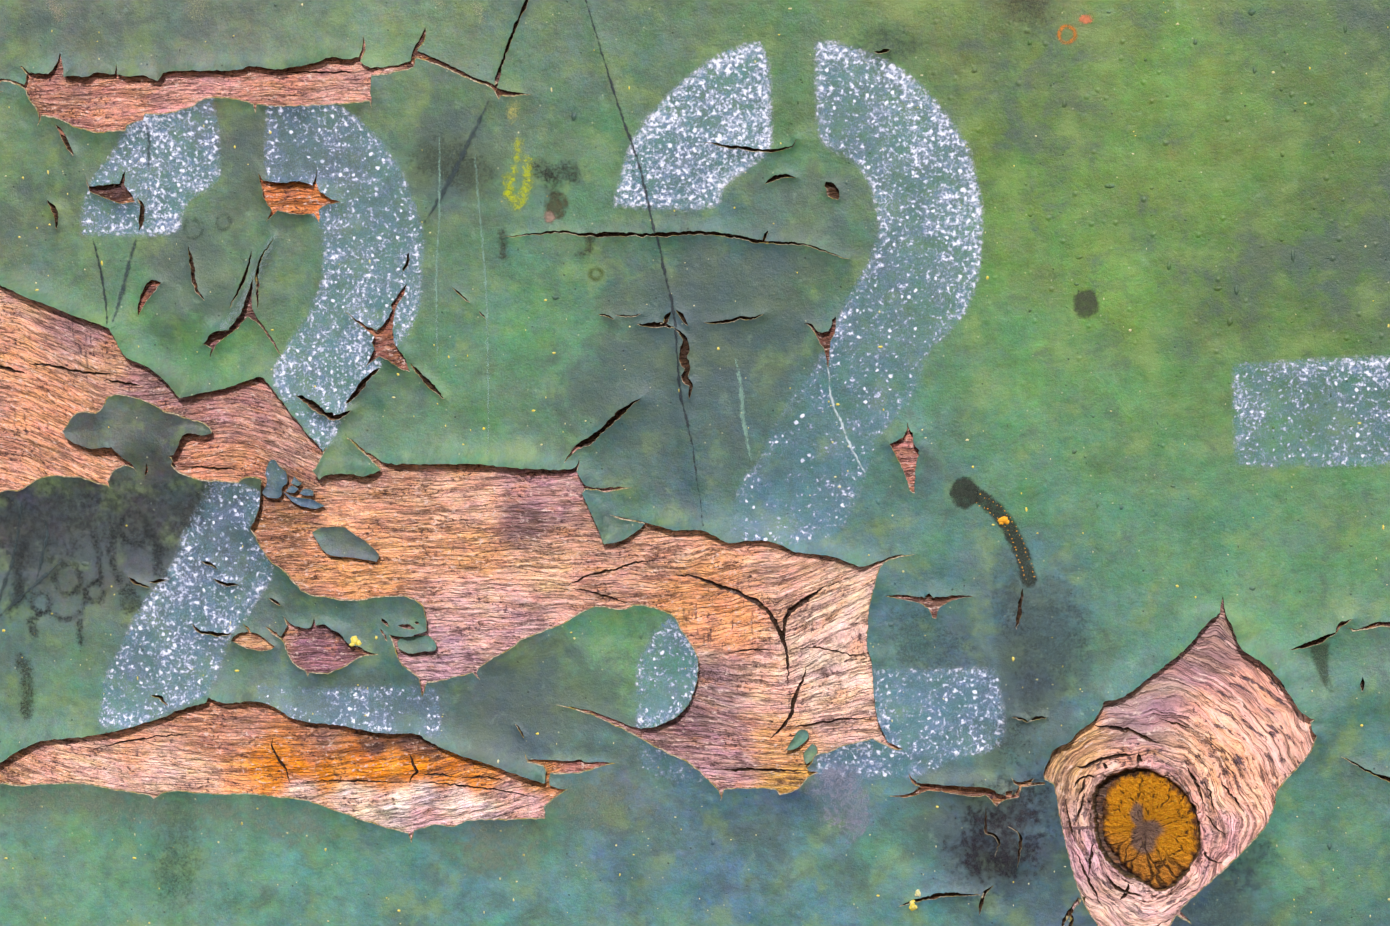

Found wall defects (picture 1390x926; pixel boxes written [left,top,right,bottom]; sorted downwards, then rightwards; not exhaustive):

peeling [0,29,531,144]
peeling [258,169,339,222]
crack [505,0,848,526]
peeling [0,680,615,842]
peeling [0,272,972,804]
crack [568,560,873,772]
peeling [890,596,1335,926]
peeling [1335,619,1390,633]